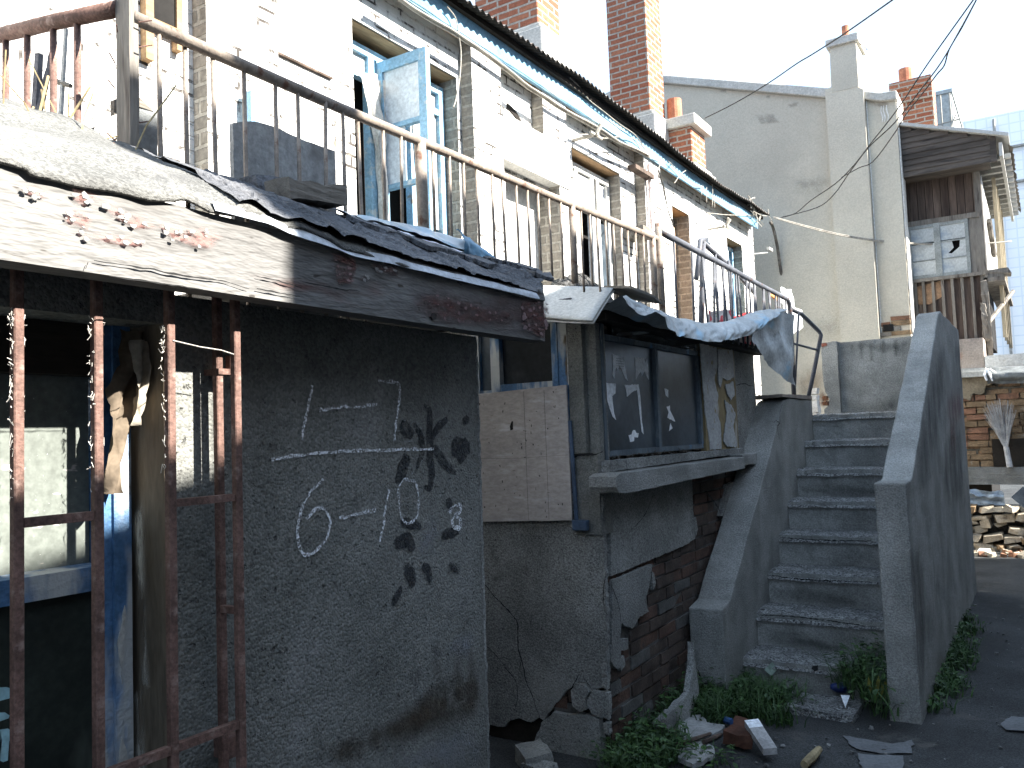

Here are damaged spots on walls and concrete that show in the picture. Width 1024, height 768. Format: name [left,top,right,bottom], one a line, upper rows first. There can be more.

peeling [699,343,737,450]
crack [485,585,541,719]
flaking render [489,470,736,749]